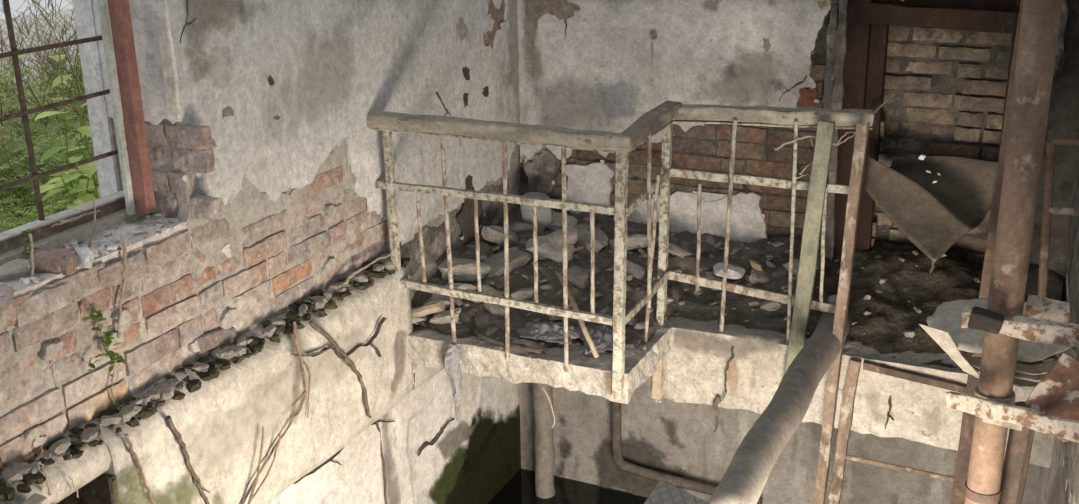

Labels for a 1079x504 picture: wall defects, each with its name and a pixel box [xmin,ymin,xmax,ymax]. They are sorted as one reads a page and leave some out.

crack [180,0,197,43]
flaking render [456,16,468,41]
flaking render [483,0,510,56]
flaking render [525,0,580,30]
flaking render [794,65,826,108]
flaking render [222,106,236,120]
flaking render [0,122,817,481]
spalling [552,379,761,501]
spalling [760,422,958,504]